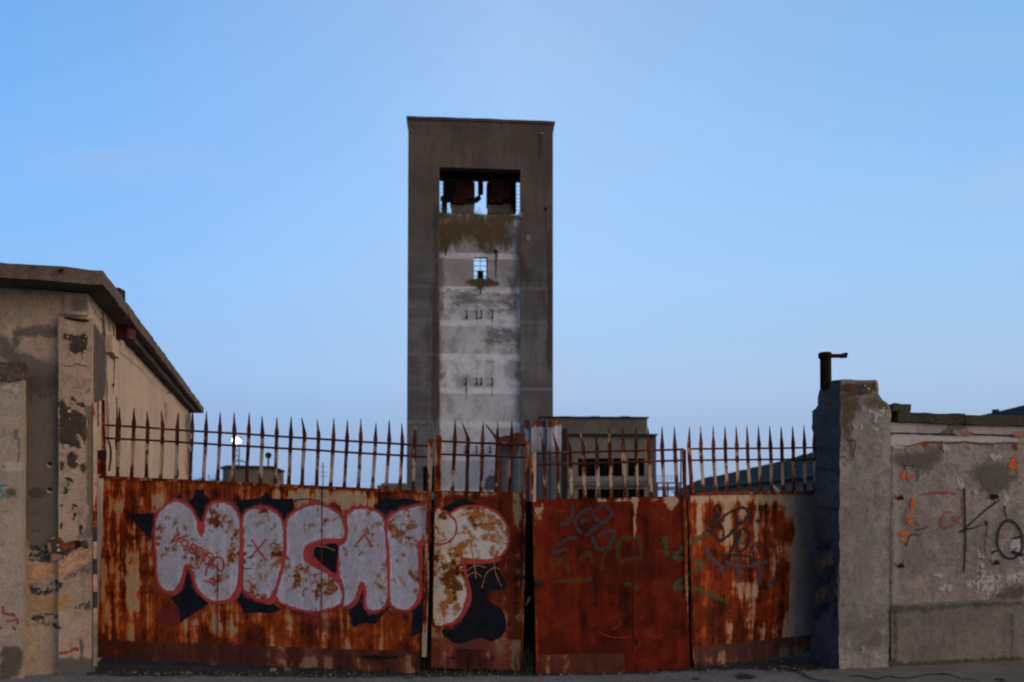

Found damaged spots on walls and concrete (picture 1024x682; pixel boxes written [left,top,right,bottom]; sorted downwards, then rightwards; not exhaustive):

spalling [63,332,88,354]
water stain [431,205,530,422]
water stain [0,325,59,548]
spalling [47,396,93,560]
spalling [898,497,915,562]
water stain [888,424,1024,657]
peeling [932,550,1024,597]
spalling [990,453,1019,473]